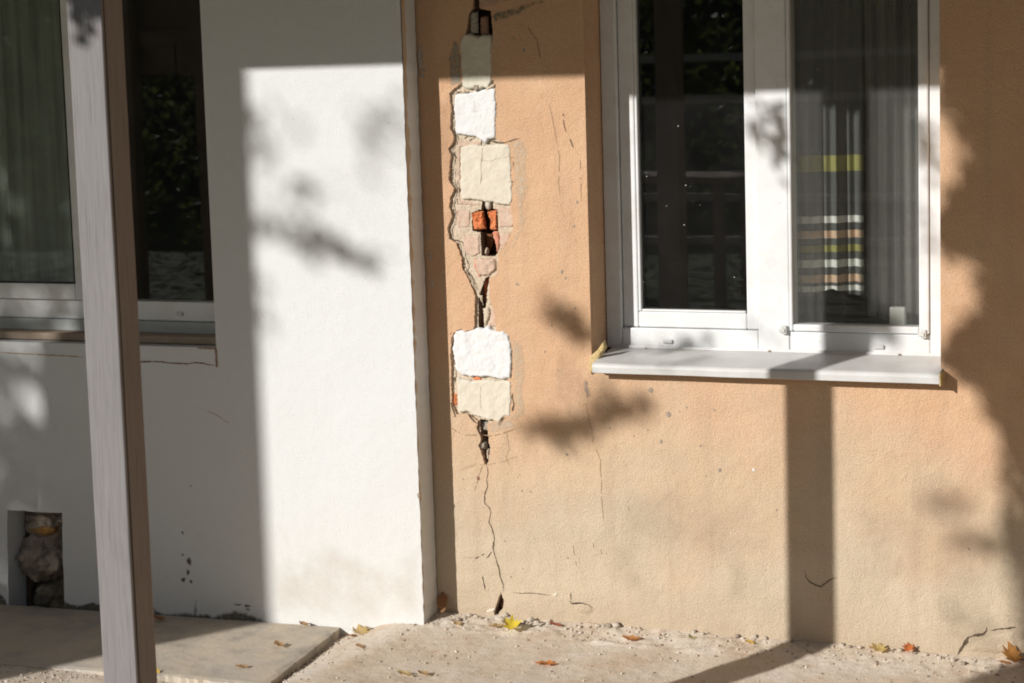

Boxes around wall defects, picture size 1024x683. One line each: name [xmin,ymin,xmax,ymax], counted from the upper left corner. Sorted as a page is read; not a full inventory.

crack [448,91,519,296]
flaking render [449,81,526,331]
crack [0,350,78,358]
crack [141,359,214,367]
flaking render [452,333,524,464]
crack [449,329,558,596]
crack [587,411,604,521]
crack [958,627,1018,654]